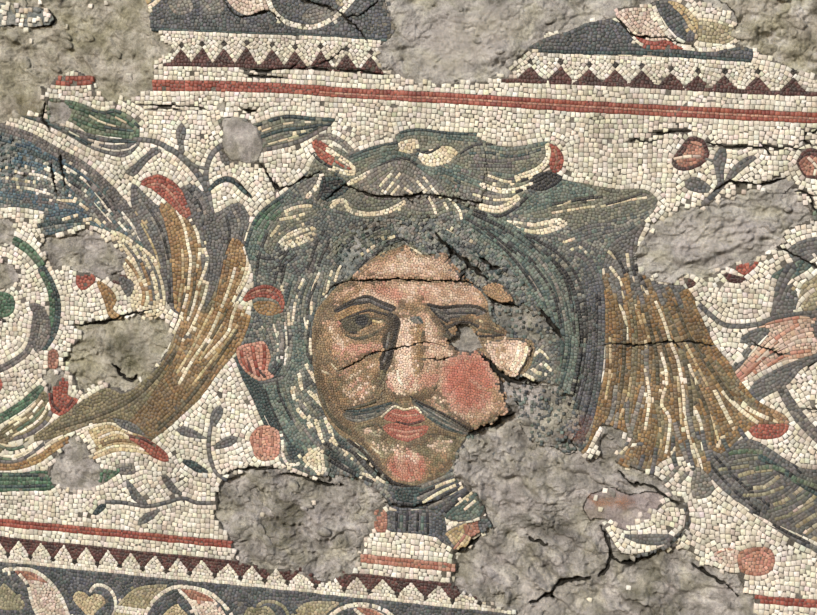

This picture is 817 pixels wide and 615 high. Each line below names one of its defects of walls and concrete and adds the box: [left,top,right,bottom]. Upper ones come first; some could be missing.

spalling [0,0,172,123]
crack [225,2,284,24]
spalling [702,0,817,74]
crack [631,130,688,143]
crack [708,131,817,154]
spalling [633,176,817,284]
crack [714,178,817,212]
spalling [43,313,173,393]
crack [341,341,450,370]
crack [481,355,538,384]
spalling [215,466,387,581]
spalling [452,378,757,615]